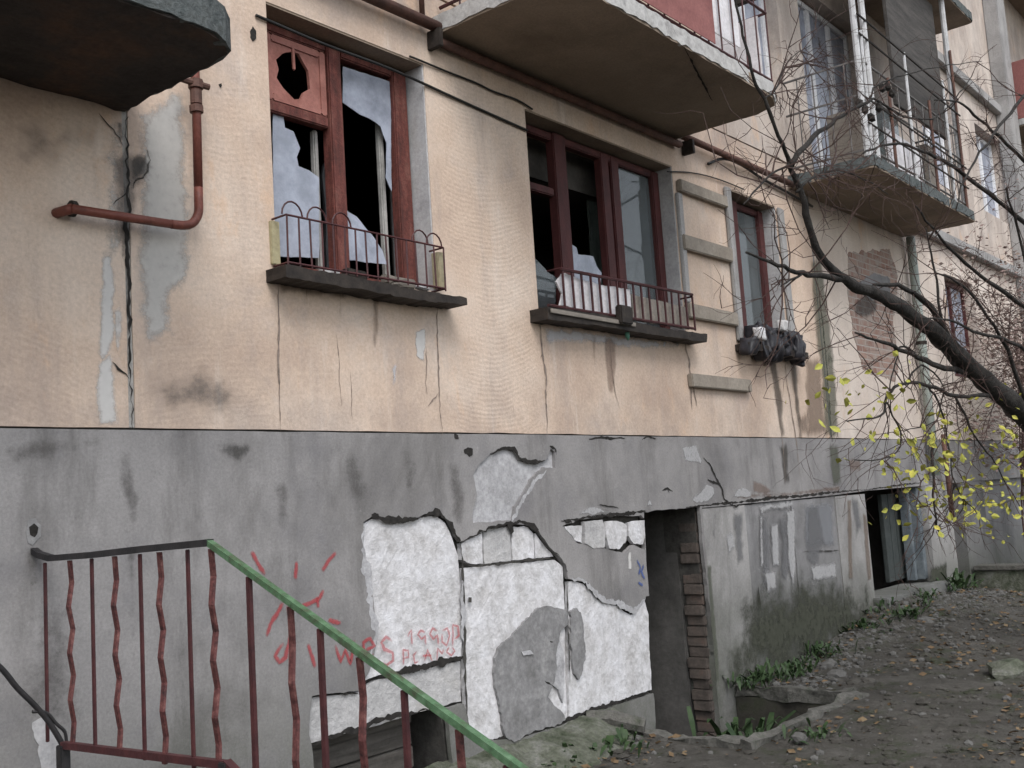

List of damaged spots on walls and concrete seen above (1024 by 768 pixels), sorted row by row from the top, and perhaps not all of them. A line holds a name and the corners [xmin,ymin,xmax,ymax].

crack [100,115,151,428]
crack [275,288,283,431]
crack [425,308,443,435]
crack [540,326,548,427]
peeling [683,445,702,463]
damp [771,364,783,433]
damp [781,447,789,480]
damp [792,365,800,426]
crack [686,364,922,508]
spalling [847,249,900,382]
spalling [309,446,652,743]
damp [732,519,869,677]